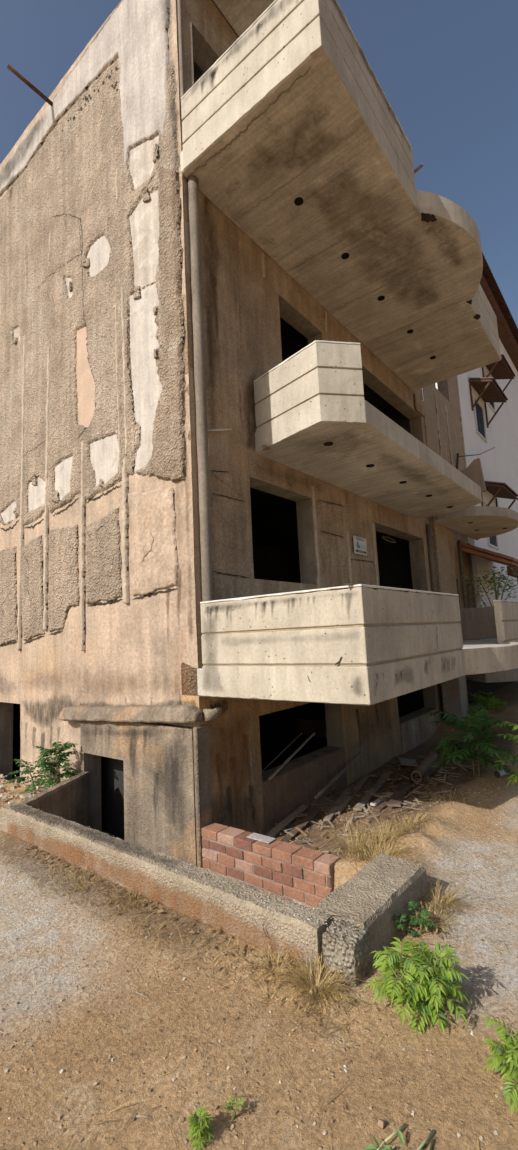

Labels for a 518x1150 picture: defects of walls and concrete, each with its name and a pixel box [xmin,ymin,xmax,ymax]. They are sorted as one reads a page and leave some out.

flaking render [82,236,111,277]
flaking render [129,135,162,473]
flaking render [76,327,96,428]
flaking render [1,456,73,524]
flaking render [90,434,119,486]
leakage [26,701,82,722]